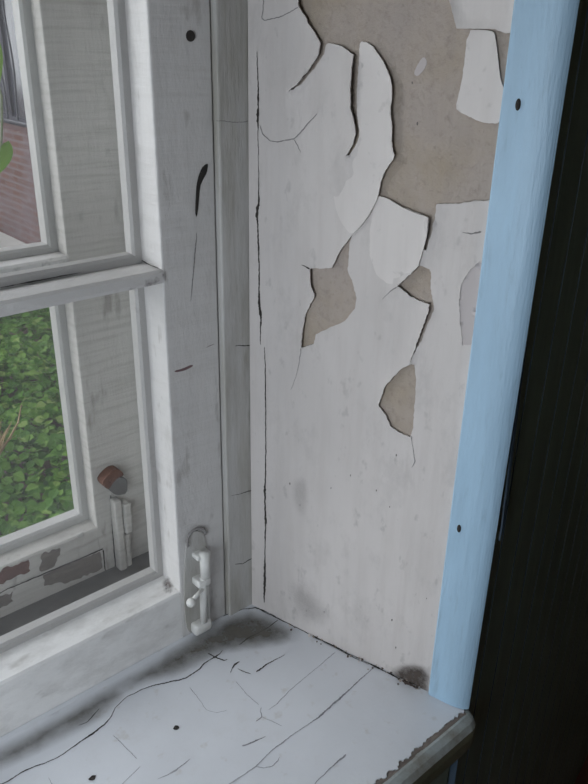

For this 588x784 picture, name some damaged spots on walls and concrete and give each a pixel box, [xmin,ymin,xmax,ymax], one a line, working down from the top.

peeling [293,0,514,384]
crack [0,58,420,784]
peeling [381,364,416,467]
peeling [0,518,116,608]
spalling [375,712,466,784]